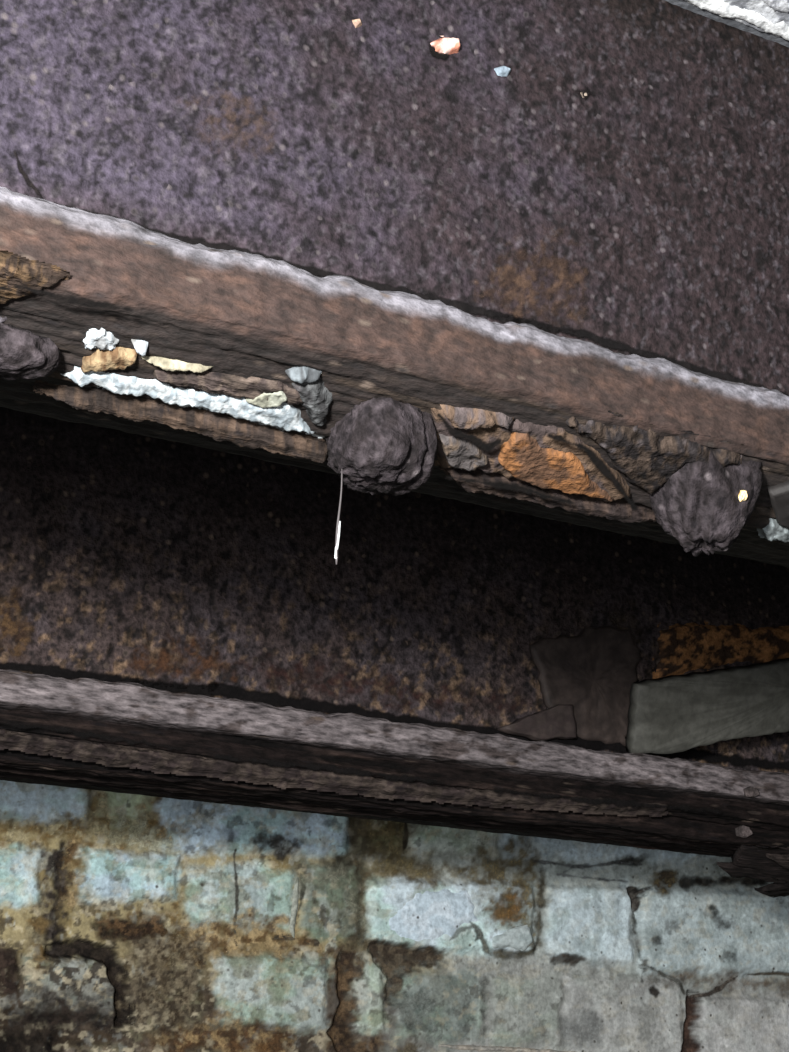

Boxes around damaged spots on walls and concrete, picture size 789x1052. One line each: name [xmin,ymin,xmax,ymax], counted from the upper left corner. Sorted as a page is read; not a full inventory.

damp [41,842,71,954]
damp [0,951,121,1052]
damp [98,912,205,1029]
damp [253,834,299,858]
damp [289,817,366,938]
crack [451,924,489,953]
damp [399,978,601,1052]
peeling [717,845,789,897]